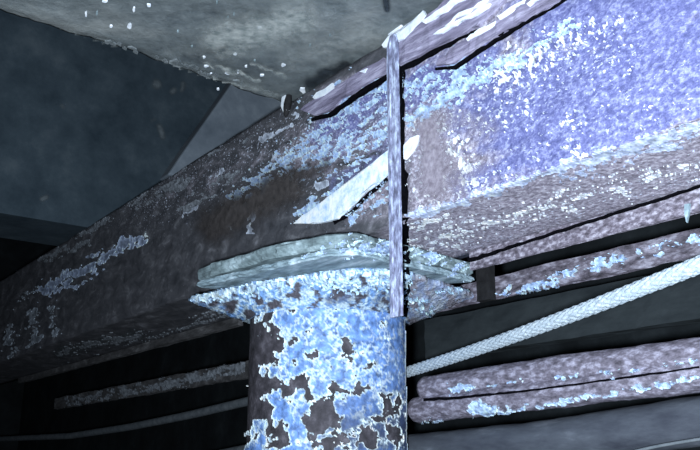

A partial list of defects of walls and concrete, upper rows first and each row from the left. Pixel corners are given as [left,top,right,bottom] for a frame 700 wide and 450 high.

spalling [105,40,138,55]
peeling [53,55,390,363]
peeling [382,0,700,297]
peeling [1,216,148,359]
peeling [402,267,438,318]
peeling [244,308,408,450]
peeling [447,383,476,396]
peeling [467,376,700,418]